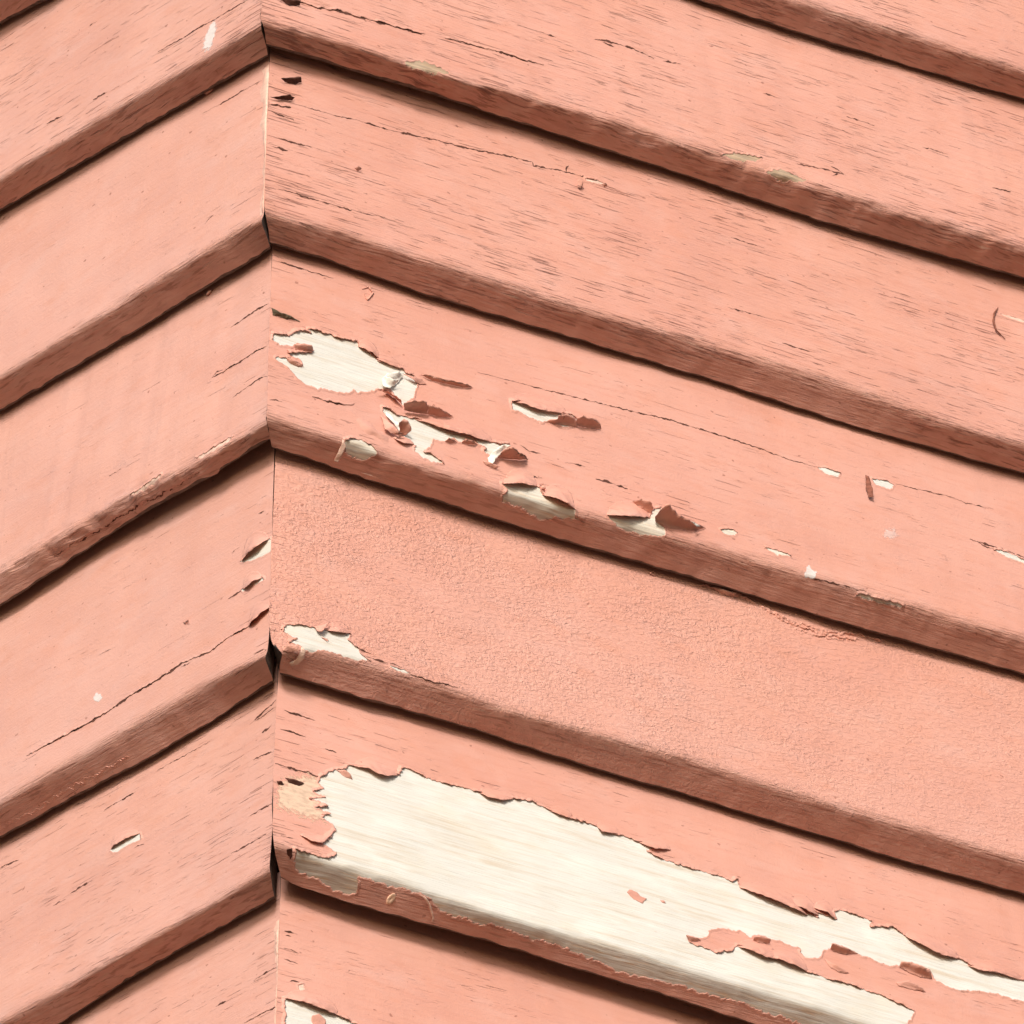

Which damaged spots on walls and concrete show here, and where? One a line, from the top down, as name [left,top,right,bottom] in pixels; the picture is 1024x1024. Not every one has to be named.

crack [215,81,584,177]
peeling [270,326,586,525]
peeling [508,393,601,430]
peeling [606,499,705,540]
peeling [239,531,271,594]
peeling [280,621,372,666]
crack [26,624,250,756]
peeling [109,830,143,855]
peeling [281,757,1024,1024]